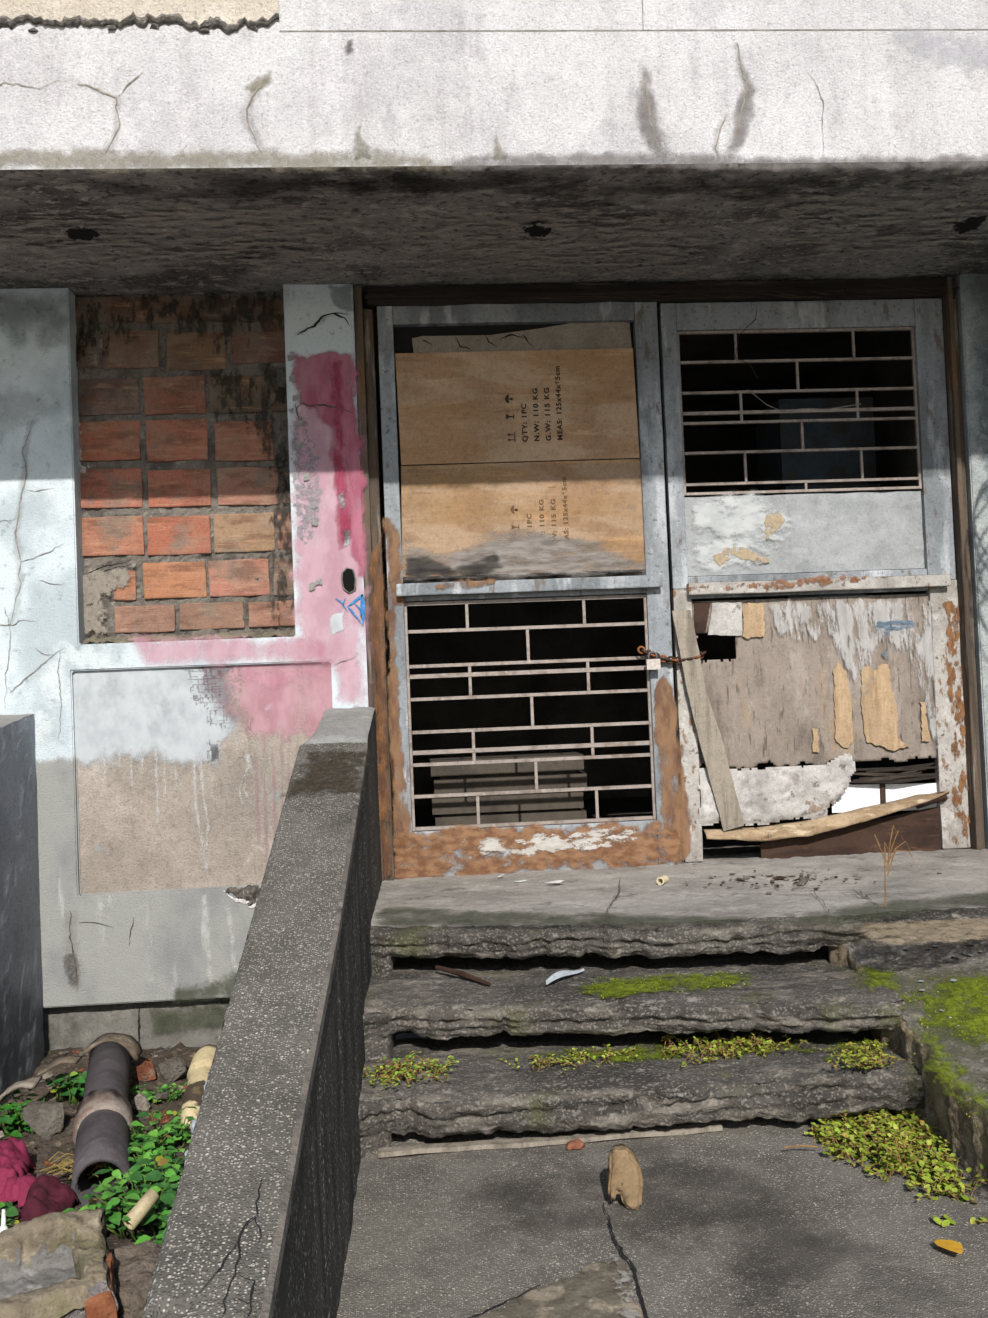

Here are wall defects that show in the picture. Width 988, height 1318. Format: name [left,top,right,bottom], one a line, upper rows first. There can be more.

spalling [0,11,279,34]
water stain [356,134,370,159]
water stain [639,72,663,152]
water stain [730,42,753,150]
peeling [287,355,322,543]
crack [0,419,64,735]
spalling [341,567,357,594]
rust [369,517,692,879]
peeling [770,599,938,748]
rust [943,600,970,847]
crack [195,1179,262,1317]
crack [603,1203,649,1318]